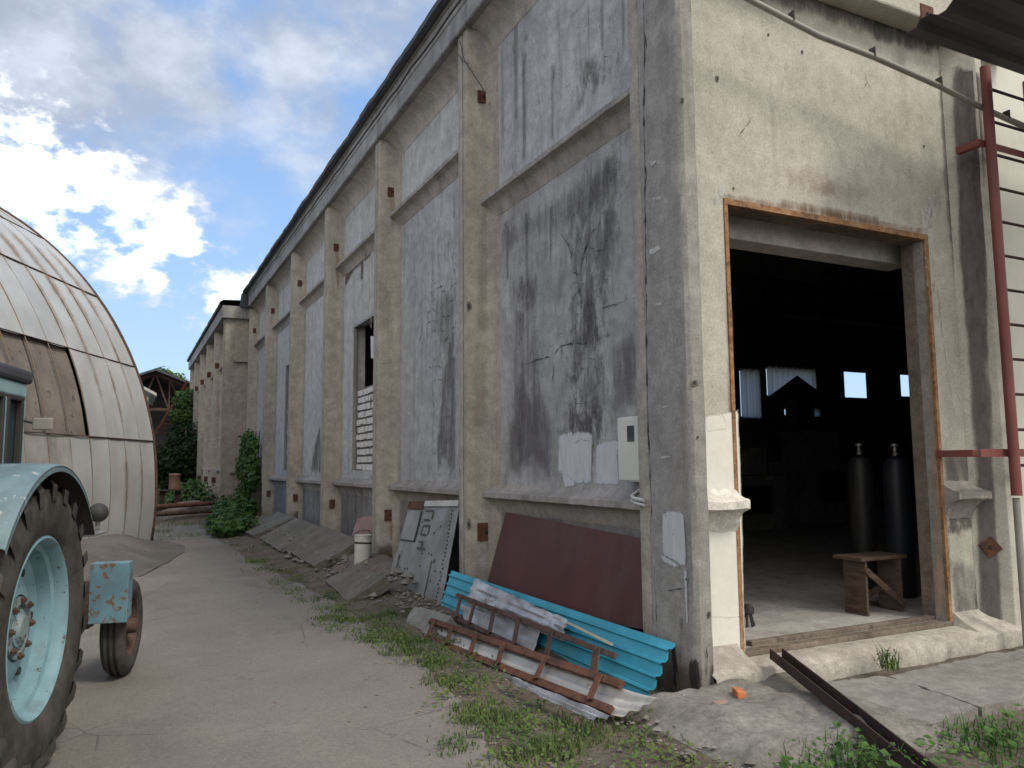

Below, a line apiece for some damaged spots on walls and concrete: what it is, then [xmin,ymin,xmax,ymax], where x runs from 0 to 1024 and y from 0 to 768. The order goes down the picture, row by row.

crack [531,3,652,517]
water stain [941,69,1001,620]